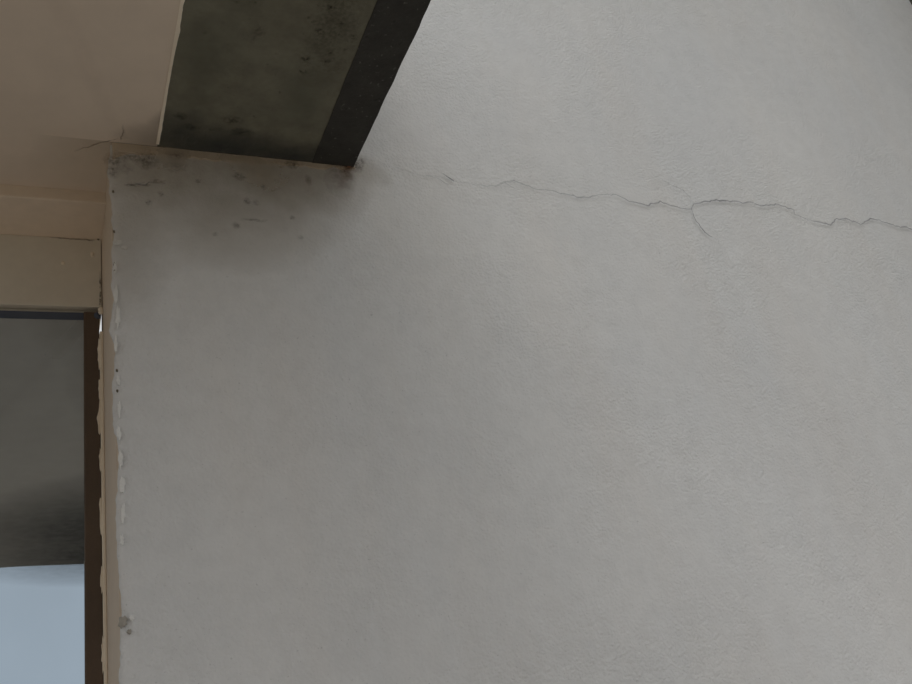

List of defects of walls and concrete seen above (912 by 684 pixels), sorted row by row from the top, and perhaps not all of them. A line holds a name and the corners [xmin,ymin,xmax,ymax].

leakage [141,129,311,192]
crack [641,199,910,234]